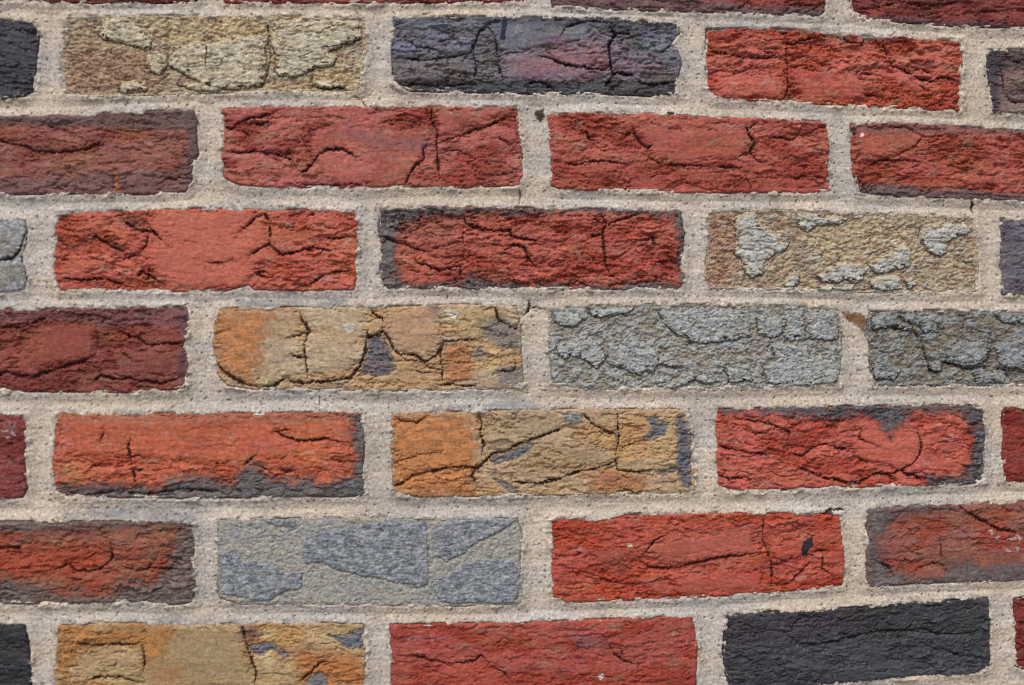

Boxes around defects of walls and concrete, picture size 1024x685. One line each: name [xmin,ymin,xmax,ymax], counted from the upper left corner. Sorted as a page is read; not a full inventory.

spalling [62,16,368,95]
crack [396,20,675,204]
crack [225,112,362,216]
crack [566,123,826,190]
crack [59,220,167,288]
crack [383,216,546,277]
spalling [705,211,977,293]
crack [207,214,477,406]
spalling [550,306,841,390]
spalling [867,311,1024,385]
crack [395,413,650,493]
crack [718,418,923,514]